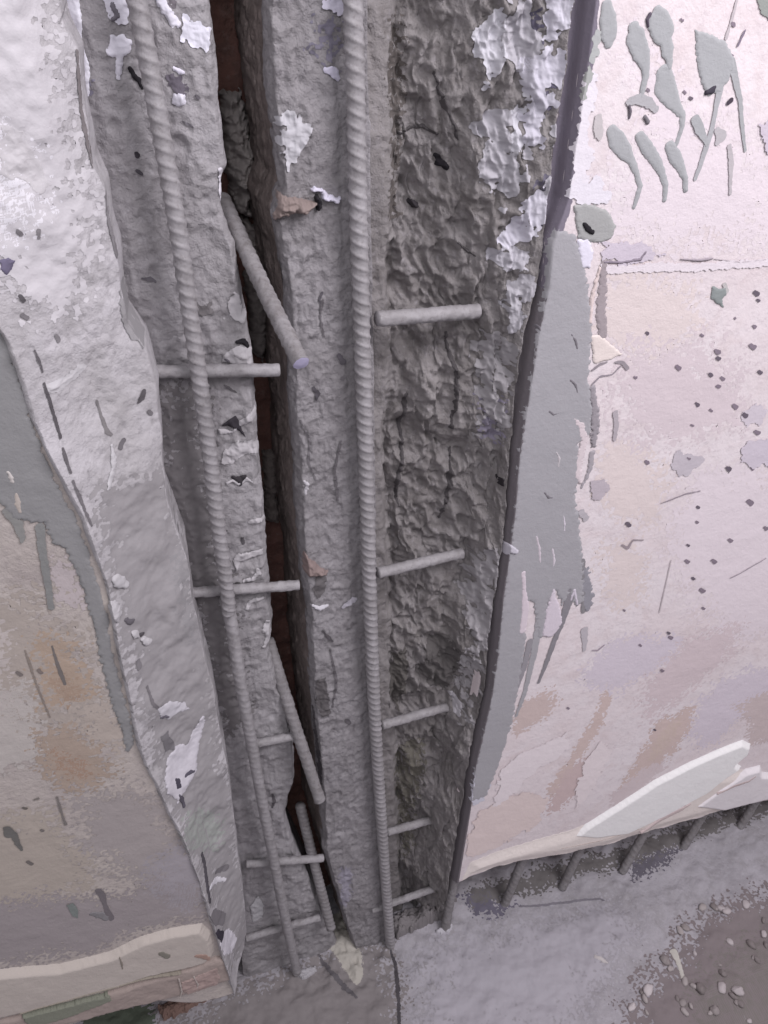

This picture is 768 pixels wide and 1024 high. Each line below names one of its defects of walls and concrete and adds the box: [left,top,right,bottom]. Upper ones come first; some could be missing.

spalling [67,0,90,96]
spalling [103,0,132,80]
spalling [156,0,212,53]
spalling [273,110,313,172]
spalling [310,186,341,211]
spalling [468,0,575,443]
hole [0,258,15,275]
spalling [223,292,247,323]
spalling [222,338,253,364]
spalling [218,405,259,486]
spalling [448,545,500,726]
peeling [164,716,206,804]